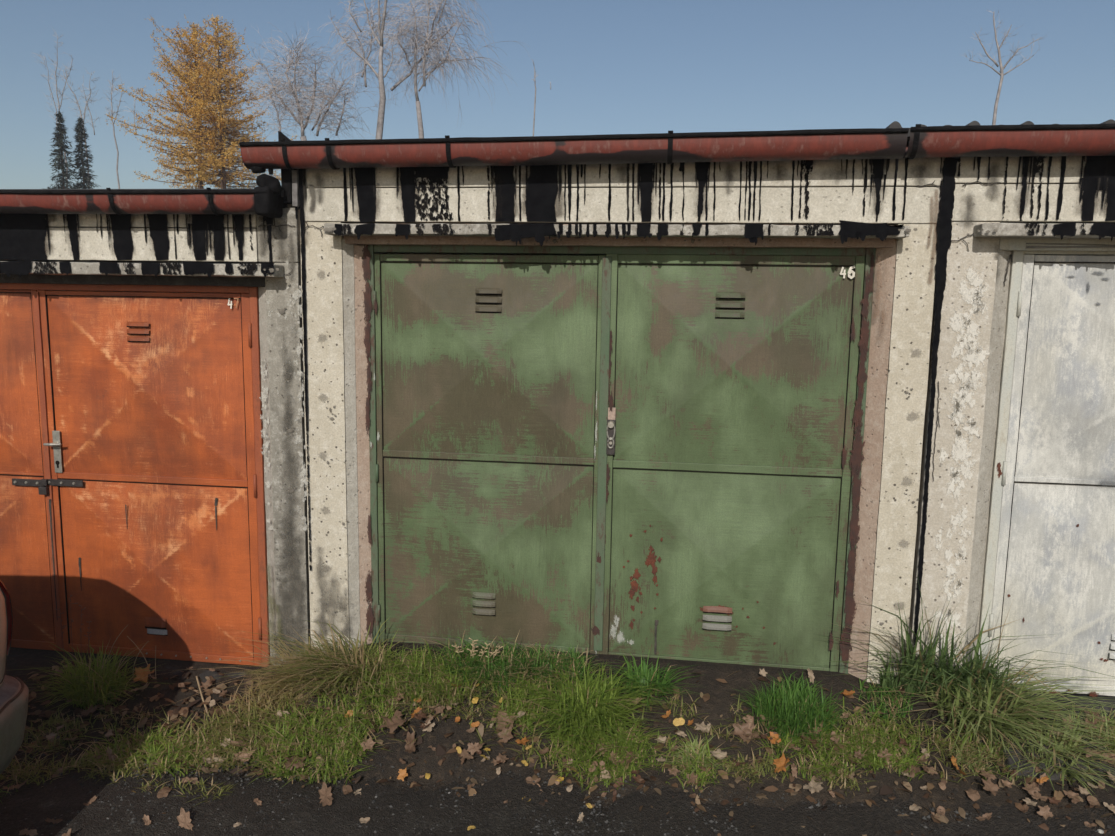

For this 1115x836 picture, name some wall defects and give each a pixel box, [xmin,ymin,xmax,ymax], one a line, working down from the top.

damp [343,168,379,223]
damp [399,166,464,222]
damp [487,160,813,222]
damp [837,158,926,221]
damp [1019,156,1066,221]
damp [1080,156,1115,221]
damp [0,213,79,261]
damp [96,169,350,665]
crack [932,381,940,481]
peeling [930,266,990,663]
corrosion [49,499,58,620]
corrosion [623,538,663,654]